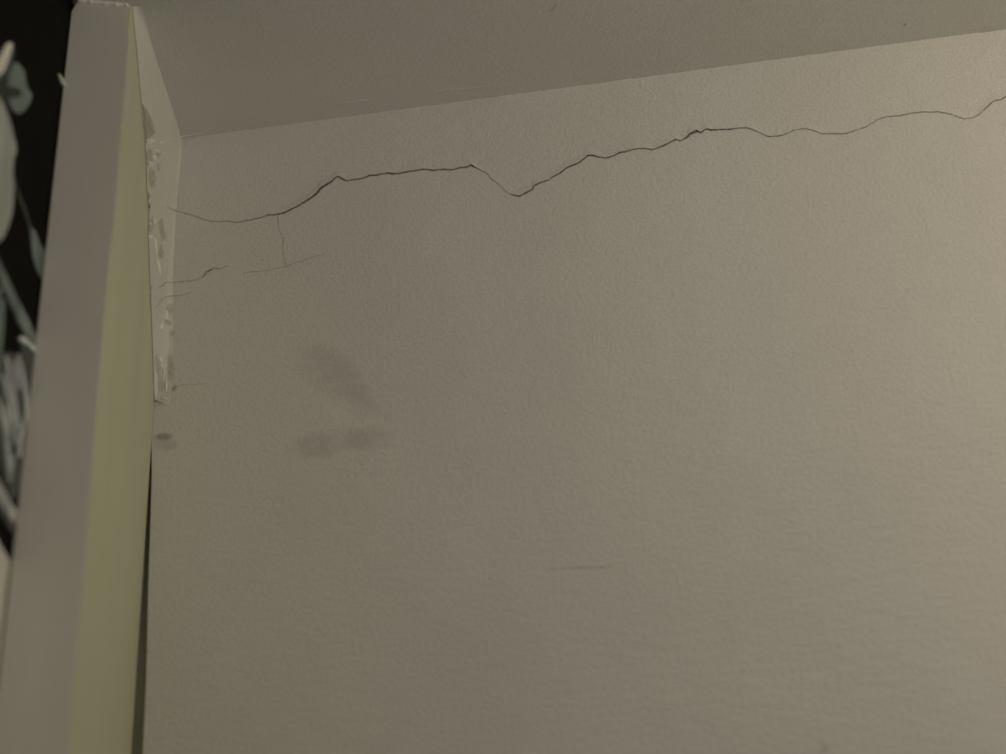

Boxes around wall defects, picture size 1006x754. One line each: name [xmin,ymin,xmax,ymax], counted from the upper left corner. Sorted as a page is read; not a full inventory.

crack [176,88,1006,223]